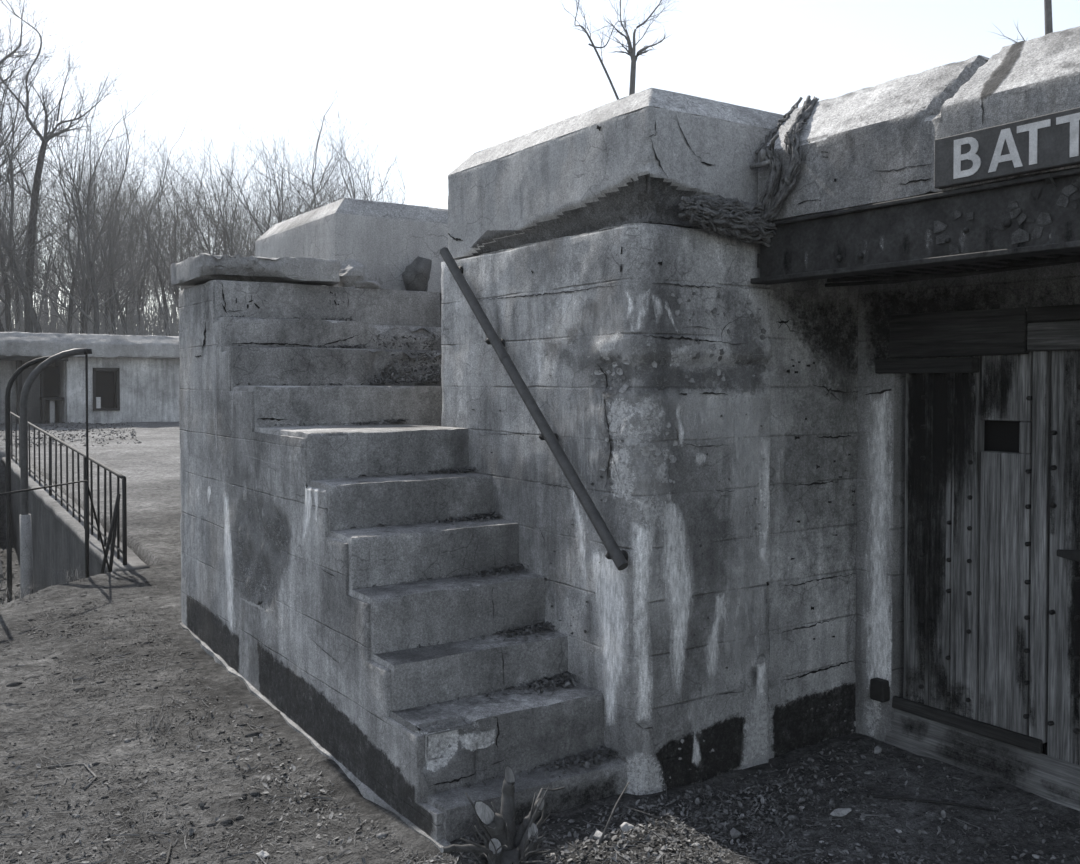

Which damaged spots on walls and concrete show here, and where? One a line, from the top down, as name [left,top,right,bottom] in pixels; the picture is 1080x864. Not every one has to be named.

crack [981,41,1024,123]
spalling [471,173,703,256]
leakage [186,496,239,673]
leakage [303,486,318,536]
crack [598,365,620,486]
leakage [572,491,691,723]
leakage [866,392,892,685]
leakage [905,356,1015,719]
leakage [1045,350,1080,723]
leakage [257,644,433,837]
spalling [415,721,495,772]
leakage [656,661,881,791]